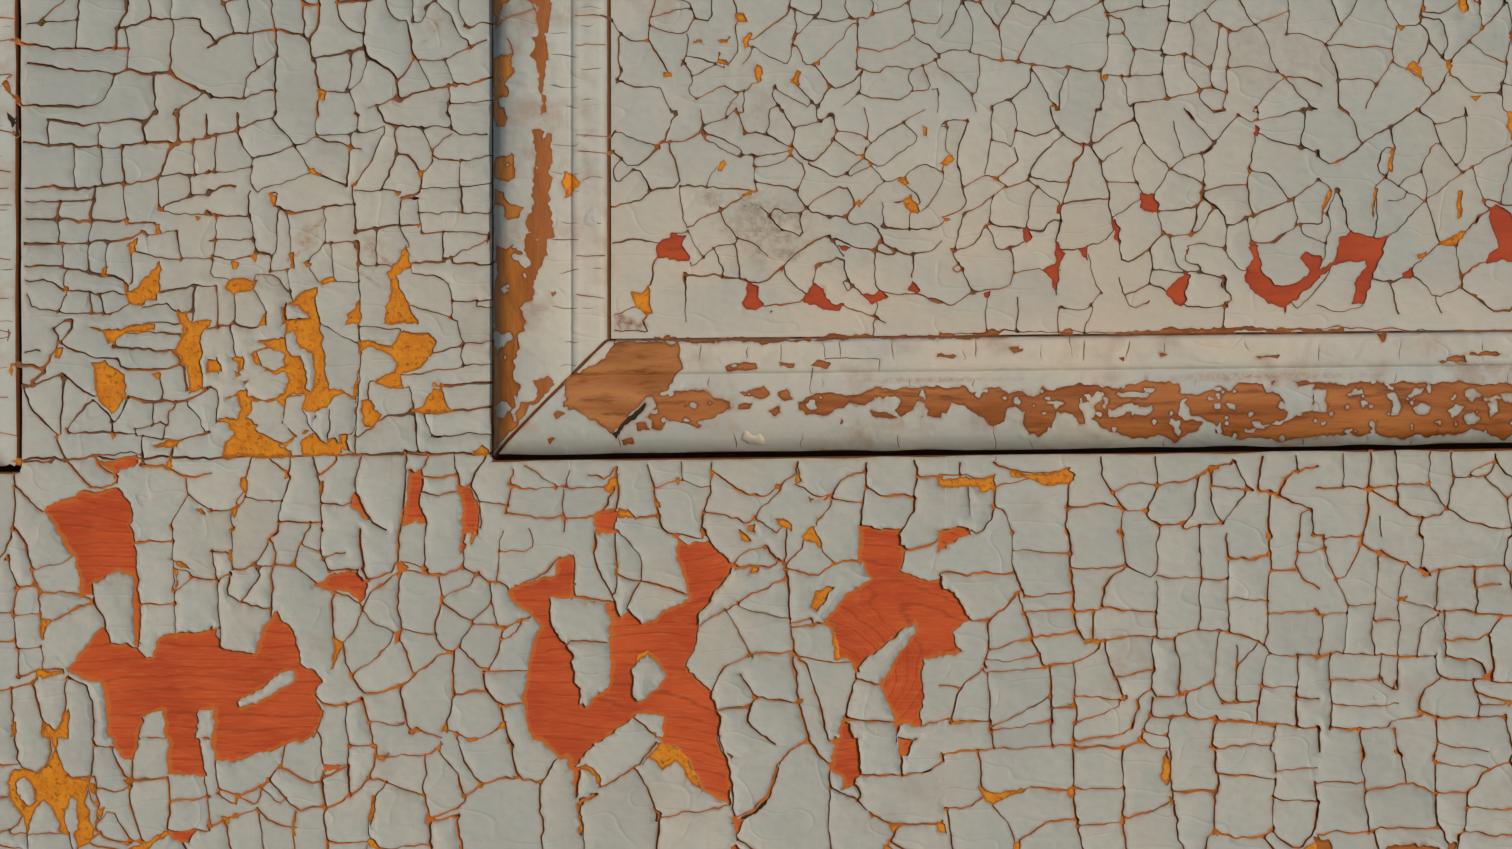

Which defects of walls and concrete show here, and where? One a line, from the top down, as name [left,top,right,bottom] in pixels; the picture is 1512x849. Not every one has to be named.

peeling [7,709,105,849]
peeling [90,261,162,414]
peeling [32,438,344,789]
peeling [173,223,437,522]
crack [0,0,687,849]
peeling [401,468,428,527]
peeling [591,473,637,534]
peeling [508,535,760,839]
peeling [829,718,863,790]
peeling [810,525,973,756]
peeling [471,0,1512,456]
crack [575,429,1512,849]